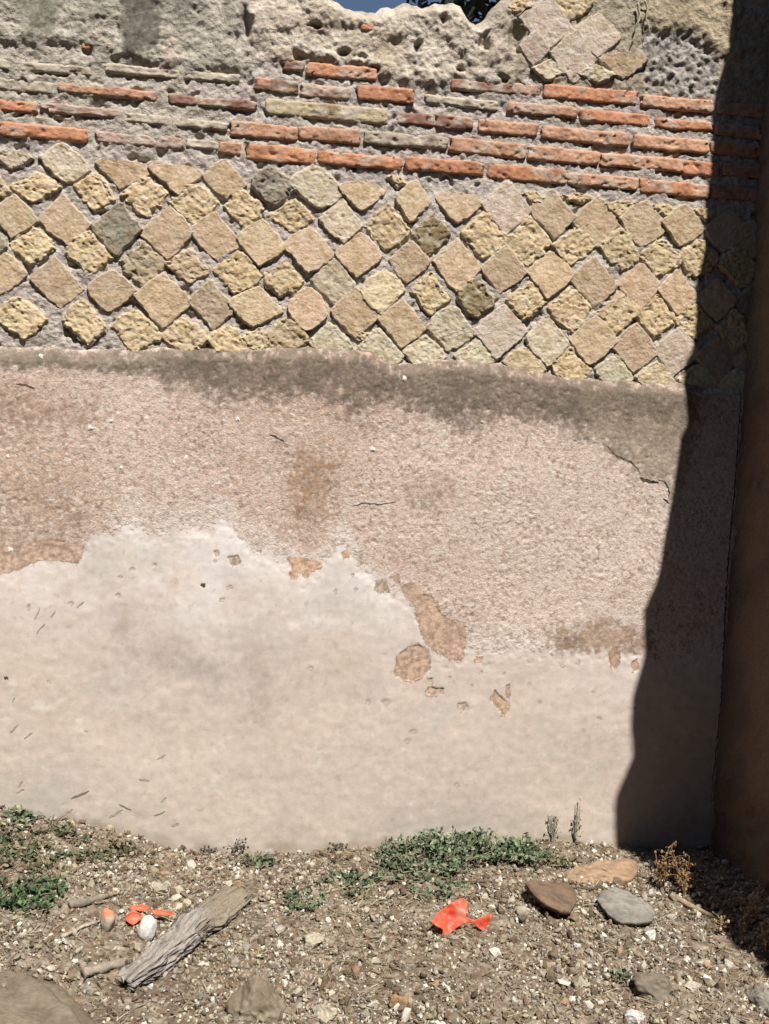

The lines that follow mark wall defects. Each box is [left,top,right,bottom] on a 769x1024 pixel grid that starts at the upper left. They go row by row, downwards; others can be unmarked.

damp [0,346,702,487]
crack [605,443,670,503]
peeling [0,537,84,574]
spalling [213,550,241,567]
peeling [287,557,322,579]
peeling [375,574,484,697]
spalling [609,646,639,673]
spalling [490,672,511,717]